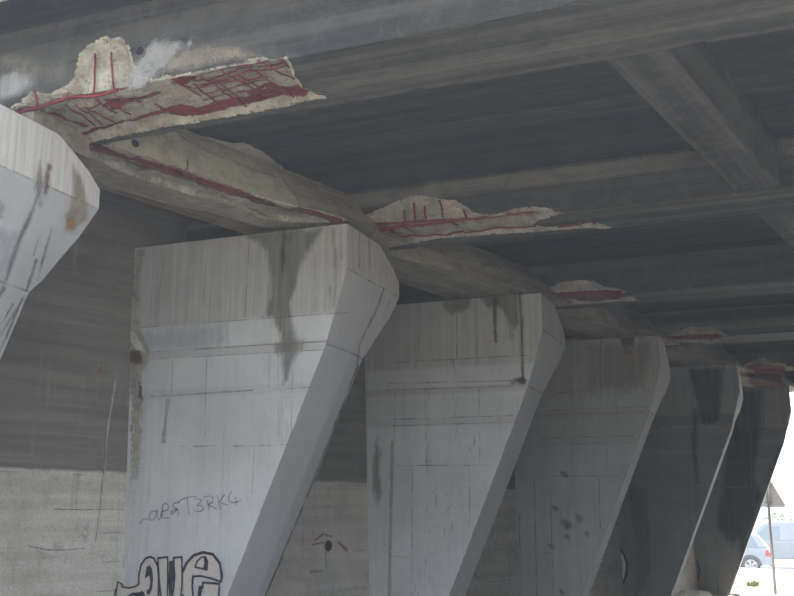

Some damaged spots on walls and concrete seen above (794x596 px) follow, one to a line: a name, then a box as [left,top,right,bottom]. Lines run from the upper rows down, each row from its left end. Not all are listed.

efflorescence [127,37,192,92]
spalling [9,36,347,223]
damp [37,164,52,194]
corrosion [66,170,86,231]
spalling [366,195,612,245]
damp [248,230,316,382]
spalling [550,280,639,305]
damp [485,293,526,384]